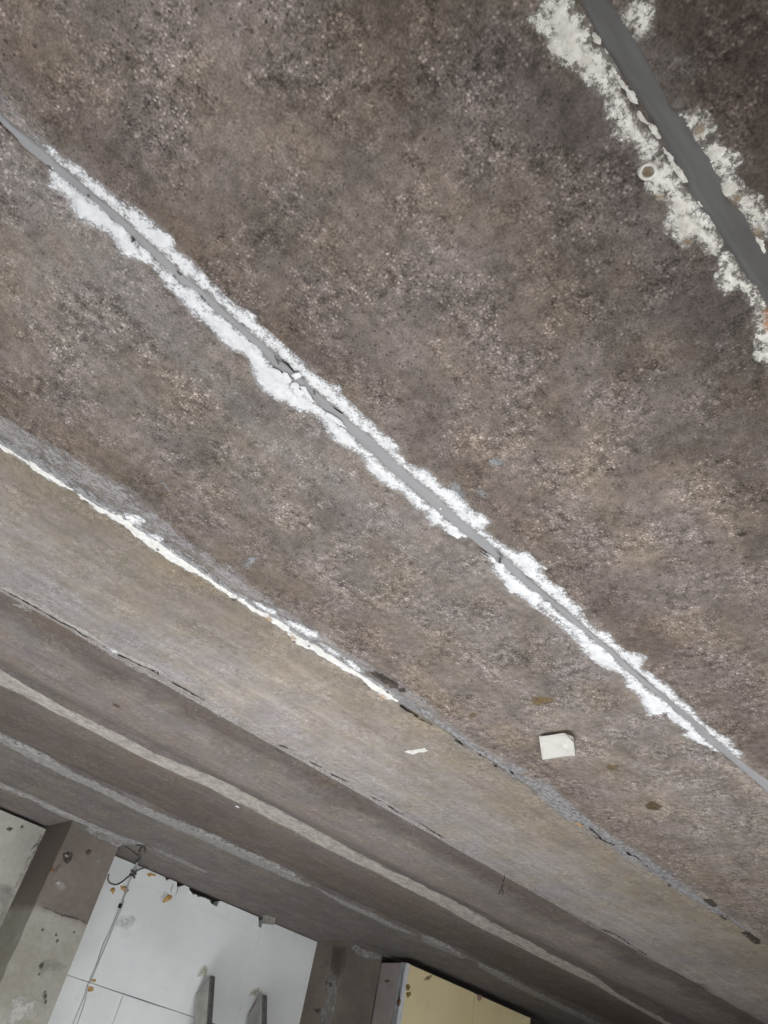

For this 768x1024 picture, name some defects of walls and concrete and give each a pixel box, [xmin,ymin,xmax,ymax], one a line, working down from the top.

water stain [529,0,768,364]
water stain [0,96,743,758]
crack [2,589,206,702]
crack [399,704,433,726]